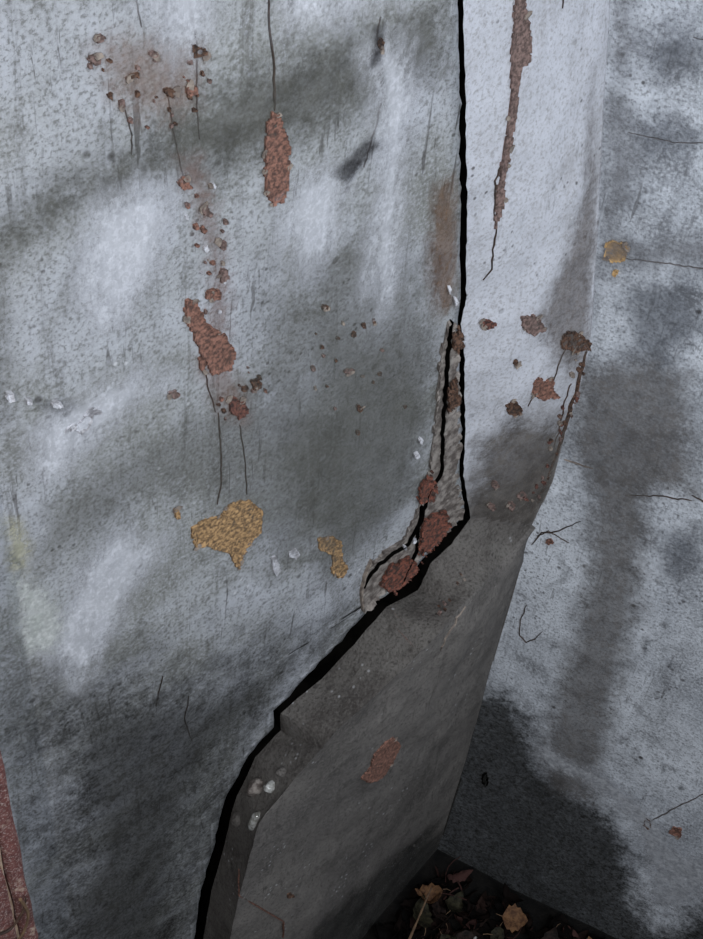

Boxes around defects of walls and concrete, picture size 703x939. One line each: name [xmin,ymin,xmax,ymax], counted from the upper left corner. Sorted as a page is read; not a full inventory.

crack [125,109,133,152]
crack [167,17,200,176]
crack [267,0,276,111]
crack [363,16,384,167]
crack [483,167,502,280]
crack [205,375,247,505]
crack [359,285,465,614]
water stain [315,286,703,939]
water stain [11,539,315,939]